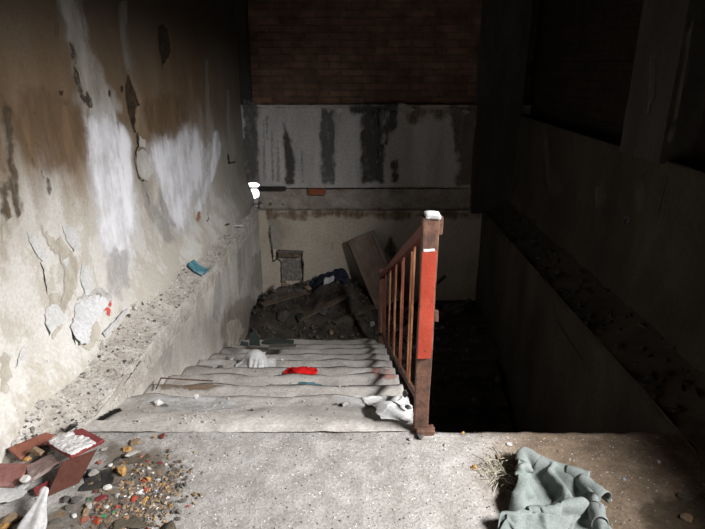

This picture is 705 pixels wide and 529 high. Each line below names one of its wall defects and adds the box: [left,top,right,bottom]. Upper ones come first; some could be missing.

leakage [0,0,136,268]
leakage [146,93,221,240]
leakage [243,99,268,186]
leakage [272,130,295,184]
leakage [319,109,335,184]
leakage [350,103,399,183]
leakage [435,104,477,185]
peeling [27,226,128,350]